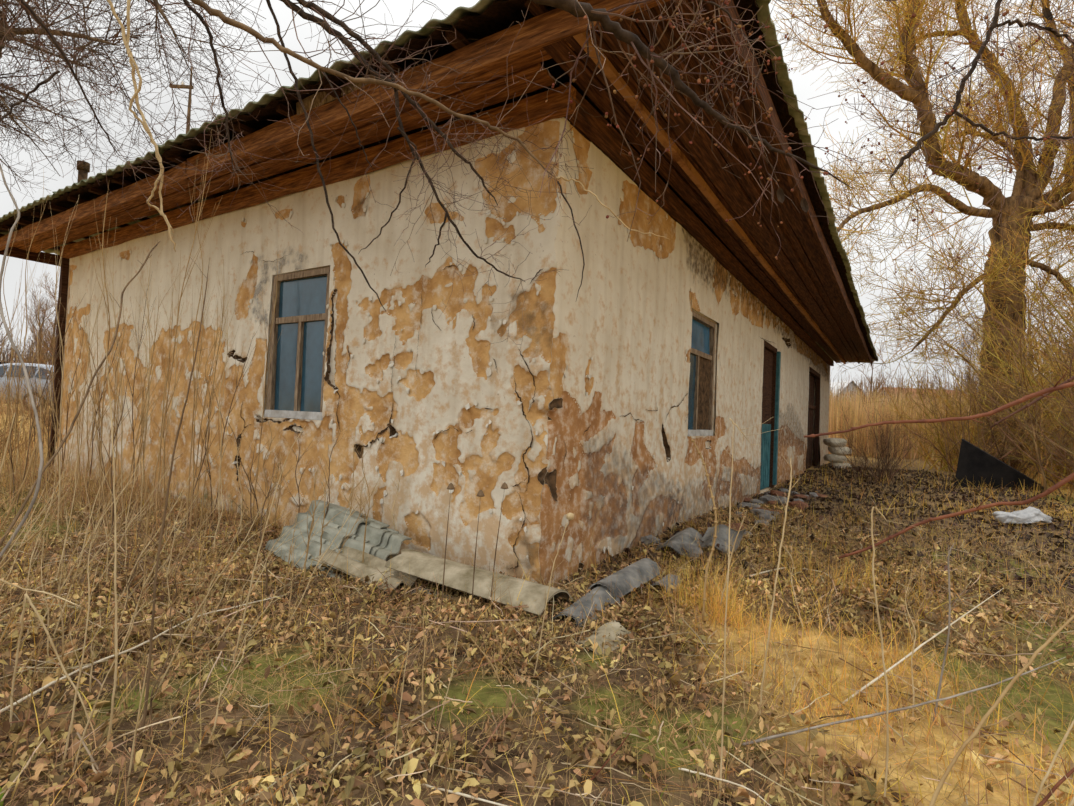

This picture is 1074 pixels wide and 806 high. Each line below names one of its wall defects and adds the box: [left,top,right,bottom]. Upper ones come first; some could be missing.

peeling [334,175,370,219]
peeling [474,120,592,245]
peeling [618,180,676,261]
peeling [689,288,700,312]
peeling [56,240,683,585]
crack [494,350,536,569]
peeling [685,416,761,511]